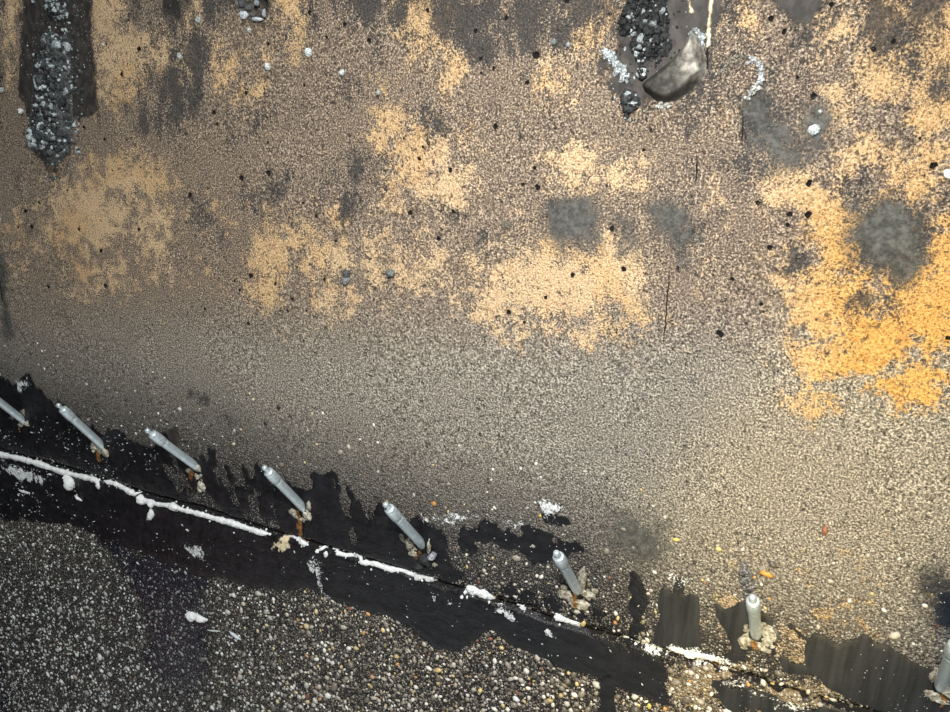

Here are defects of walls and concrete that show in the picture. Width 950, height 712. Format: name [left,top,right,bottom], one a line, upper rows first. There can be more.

crack [0,447,879,712]